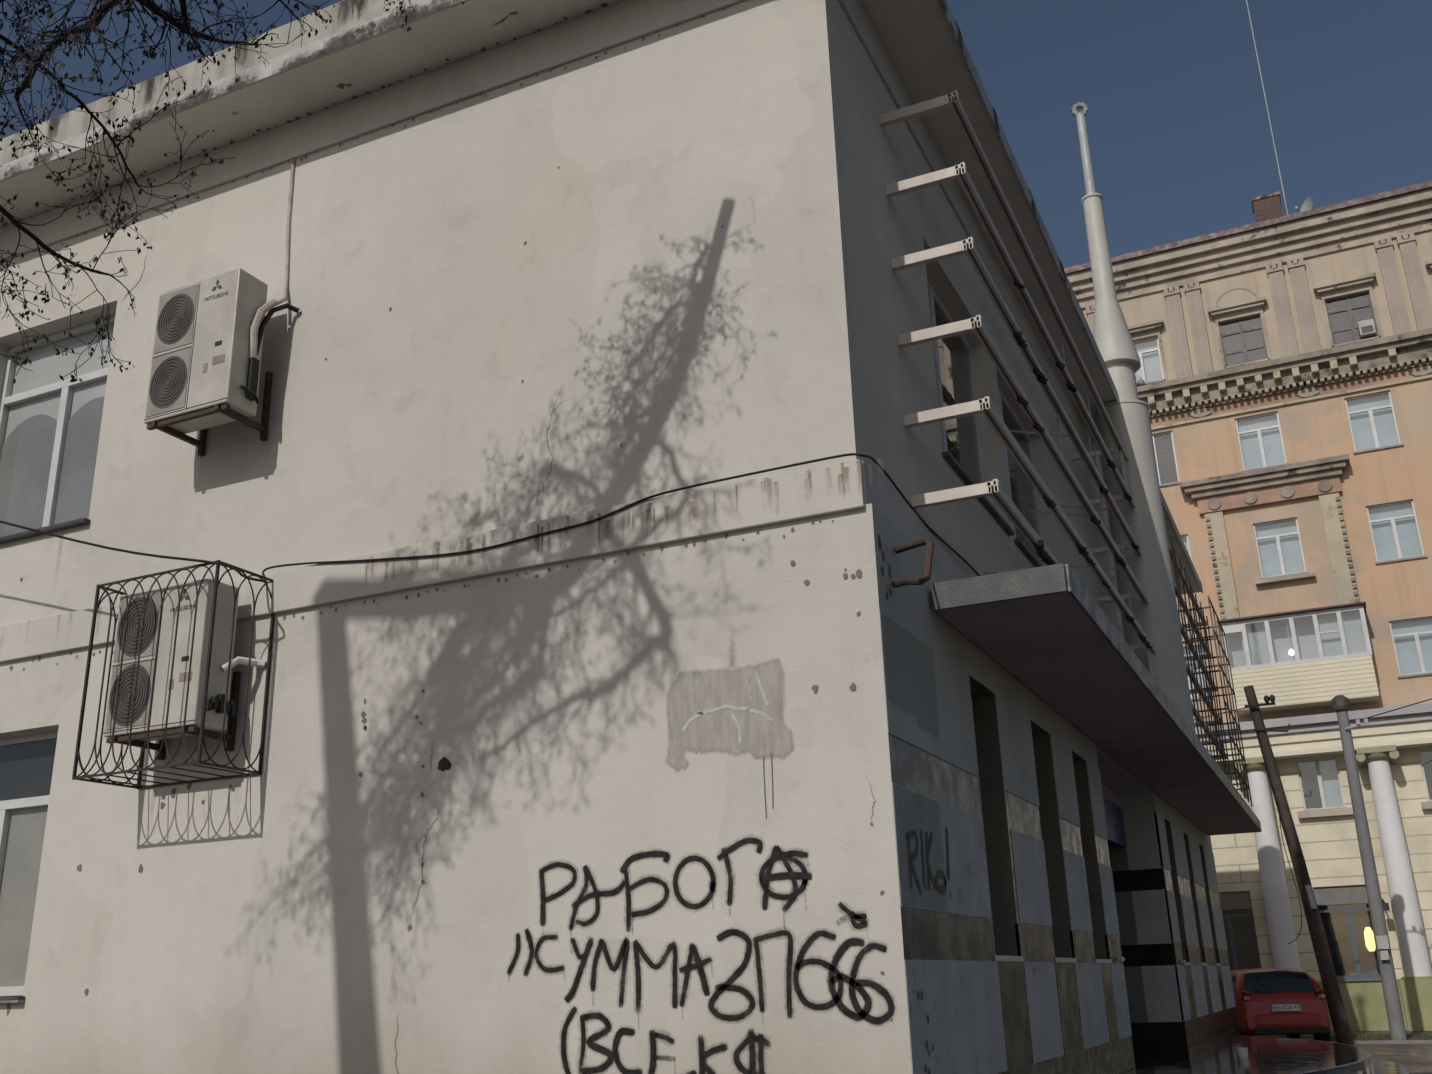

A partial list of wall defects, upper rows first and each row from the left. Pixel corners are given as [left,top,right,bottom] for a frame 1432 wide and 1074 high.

water stain [339,0,364,18]
crack [534,398,565,510]
crack [410,740,439,921]